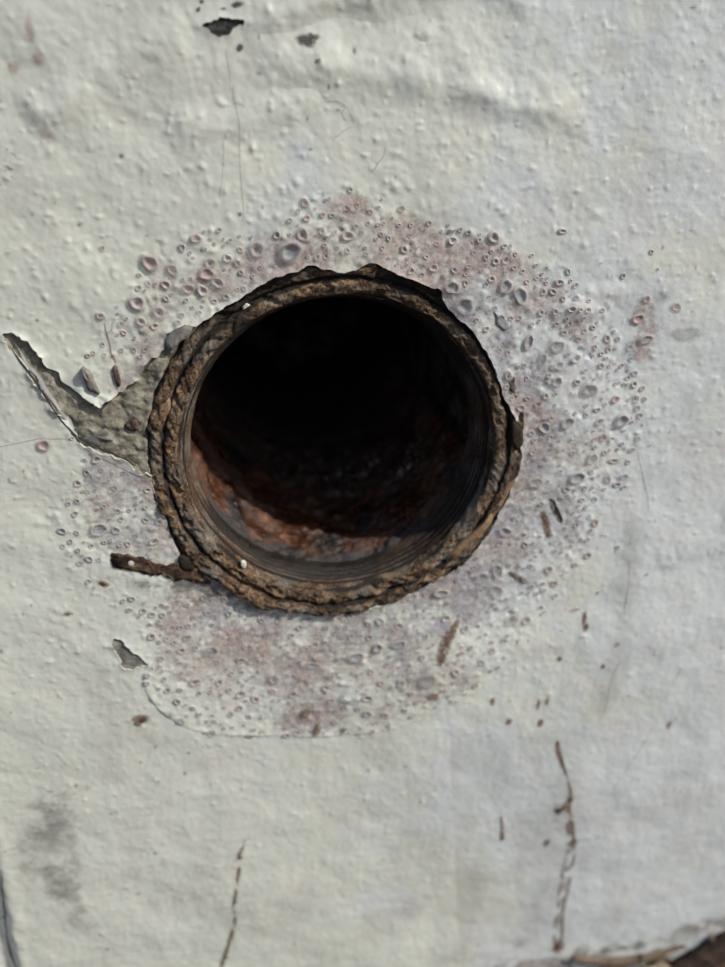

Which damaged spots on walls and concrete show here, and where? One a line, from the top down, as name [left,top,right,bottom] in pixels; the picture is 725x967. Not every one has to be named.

peeling [202,17,244,37]
peeling [3,322,202,476]
rust [159,398,171,423]
rust [190,318,468,562]
rust [510,421,523,450]
rust [446,466,521,563]
peeling [112,639,148,670]
rust [437,620,460,666]
rust [552,741,578,953]
rust [220,846,244,967]